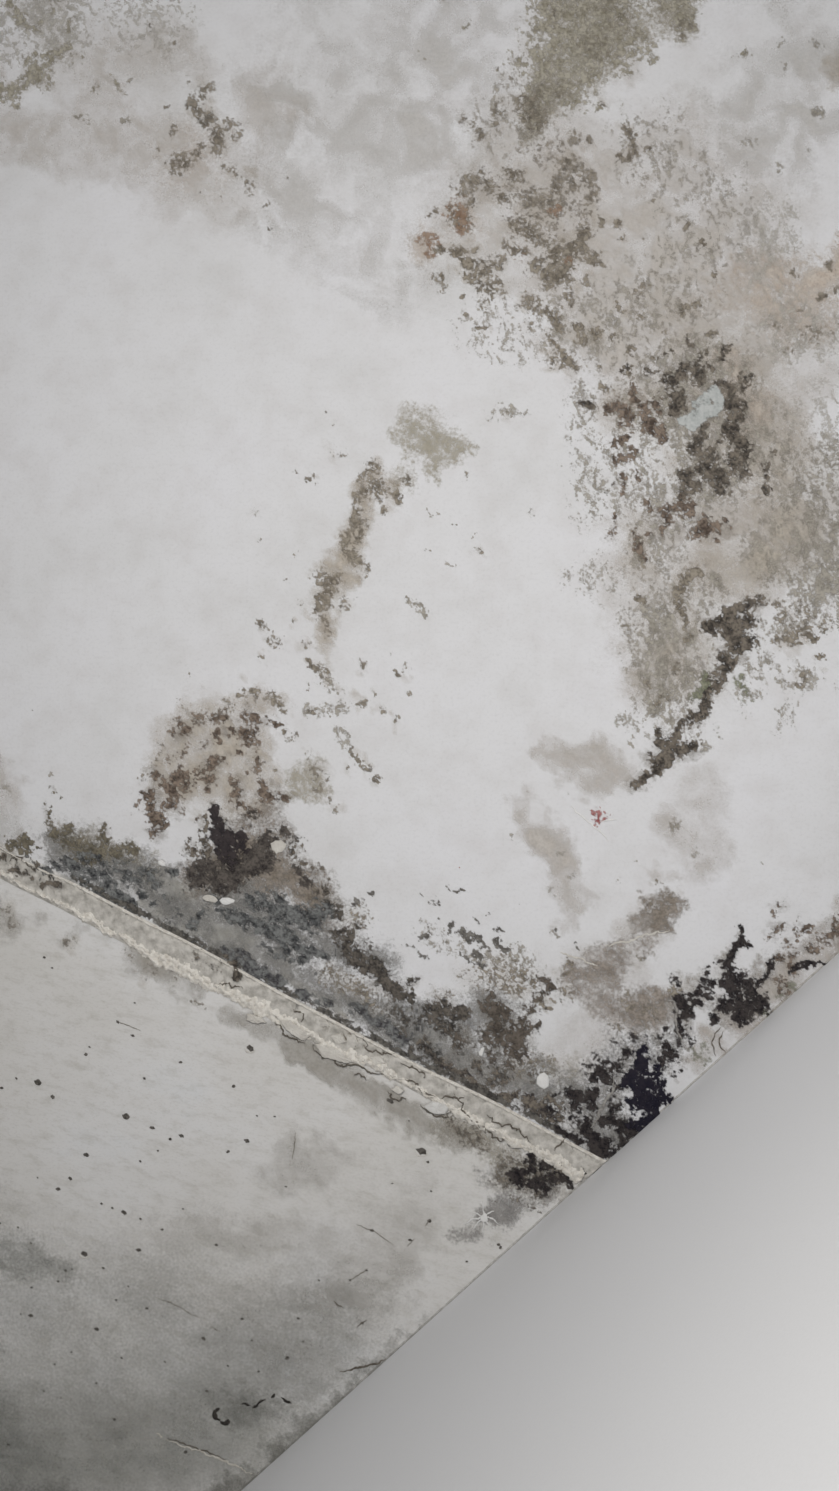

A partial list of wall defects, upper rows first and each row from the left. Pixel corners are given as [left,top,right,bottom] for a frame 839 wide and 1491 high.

water stain [0,0,193,160]
water stain [74,0,839,791]
water stain [0,409,839,1241]